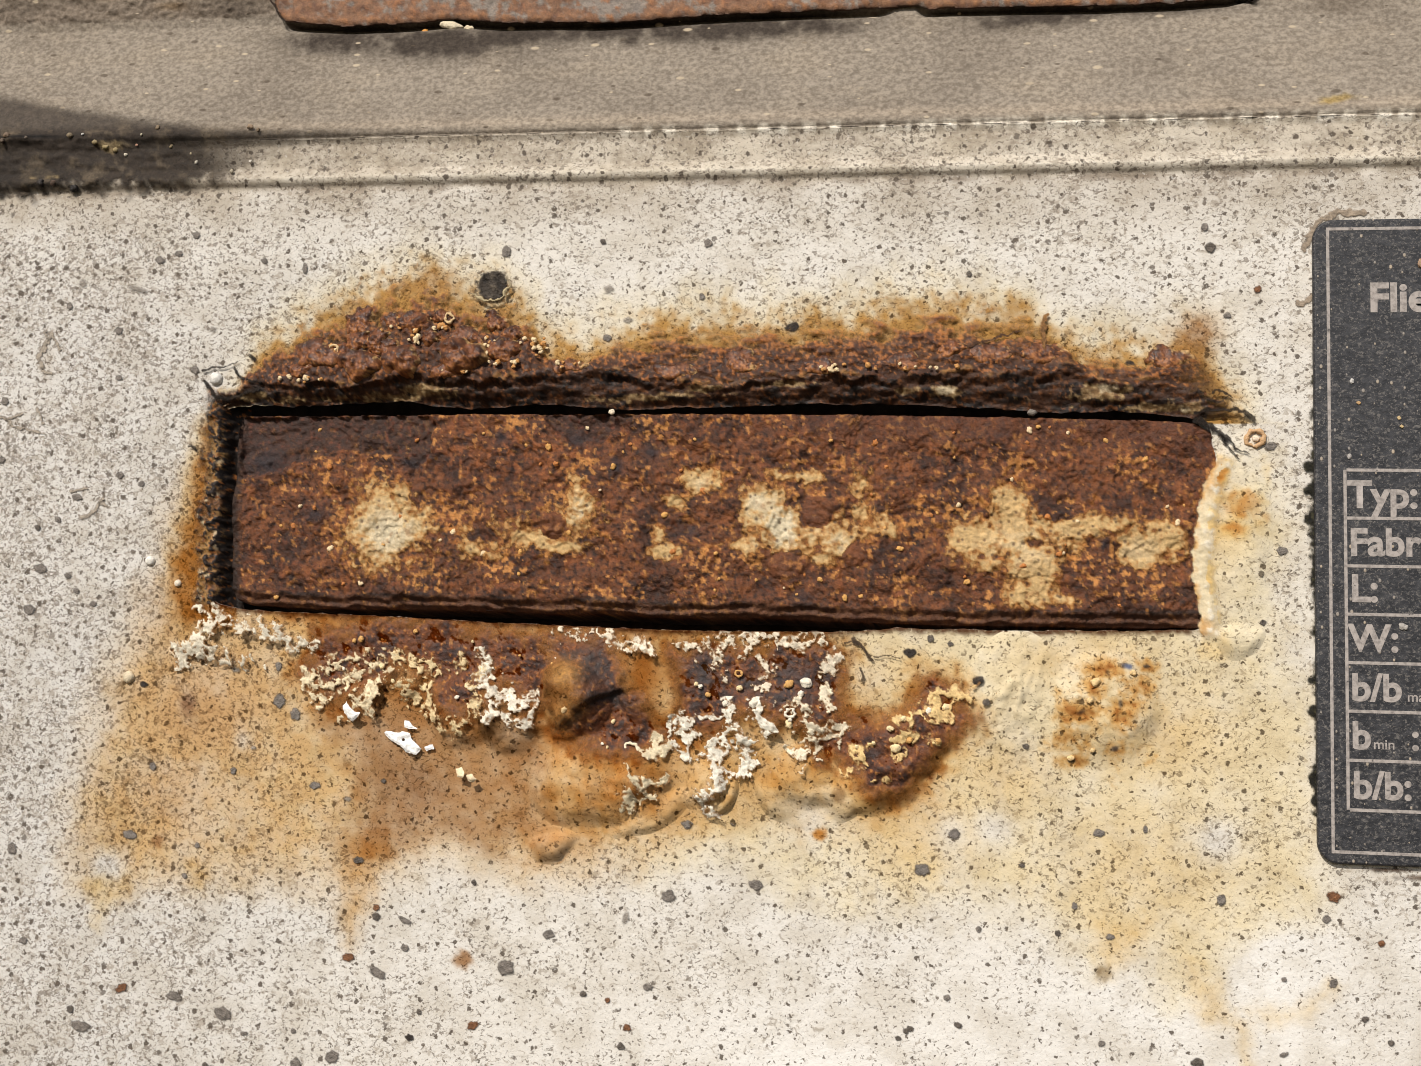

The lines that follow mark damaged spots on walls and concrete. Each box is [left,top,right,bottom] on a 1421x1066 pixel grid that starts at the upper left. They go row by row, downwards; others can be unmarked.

leakage [0,99,321,198]
corrosion [193,282,1228,801]